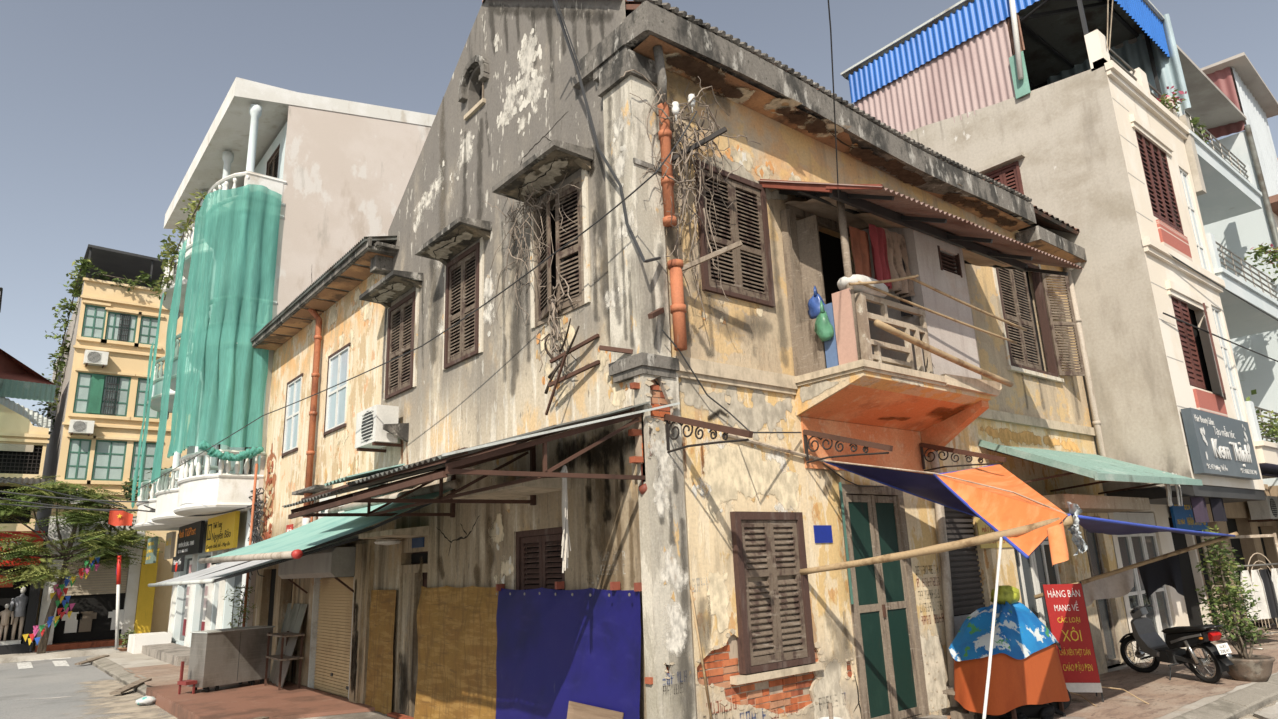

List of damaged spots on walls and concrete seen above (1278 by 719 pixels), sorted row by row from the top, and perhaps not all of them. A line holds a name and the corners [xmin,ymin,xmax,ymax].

flaking render [496,28,547,136]
peeling [597,347,845,522]
flaking render [645,546,688,684]
flaking render [694,527,856,719]